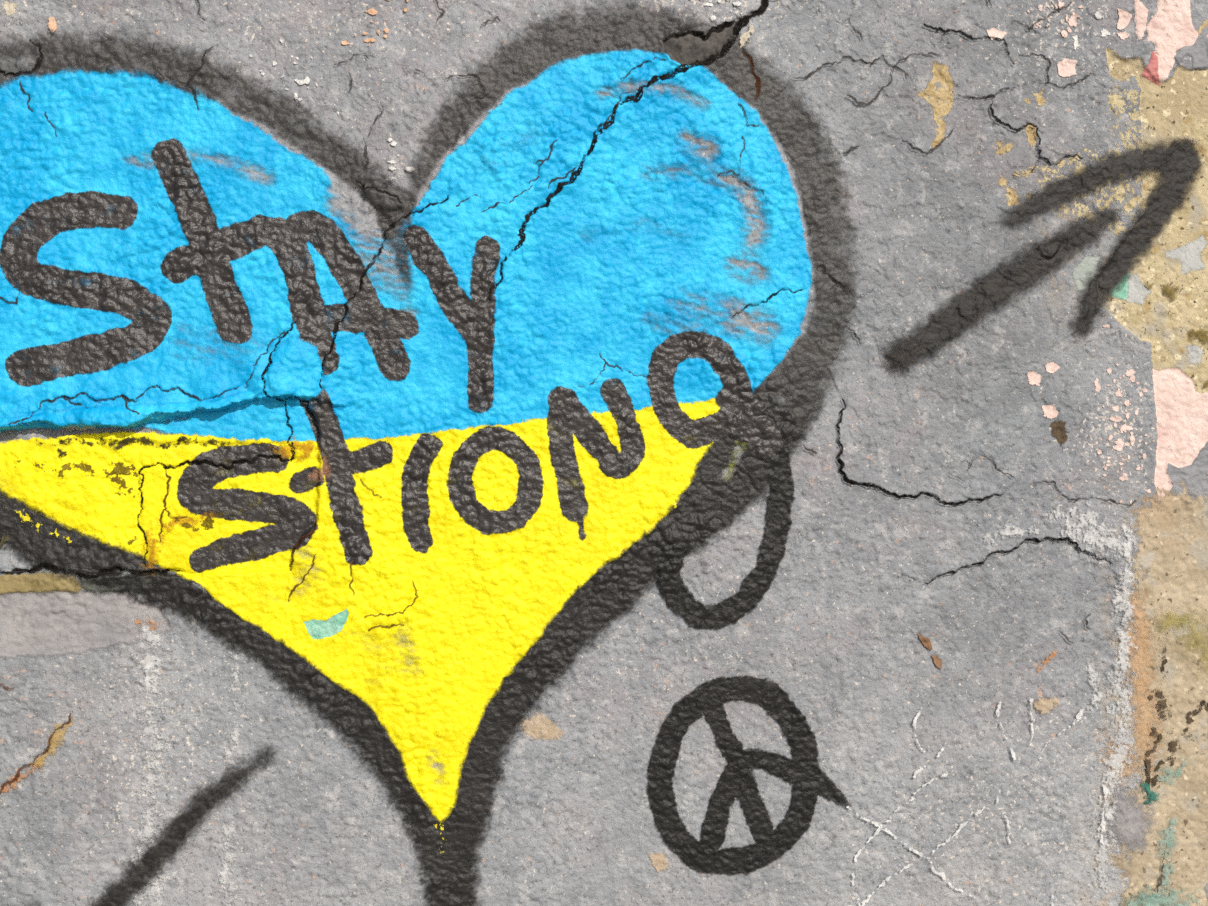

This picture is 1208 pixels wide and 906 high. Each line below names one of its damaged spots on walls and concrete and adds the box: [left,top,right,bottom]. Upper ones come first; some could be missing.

crack [796,0,1095,175]
crack [0,0,769,579]
crack [733,264,874,316]
crack [1038,246,1060,259]
crack [803,398,1136,506]
peeling [996,0,1208,906]
crack [288,519,317,602]
crack [349,561,418,631]
crack [924,537,1111,584]
crack [0,713,71,794]